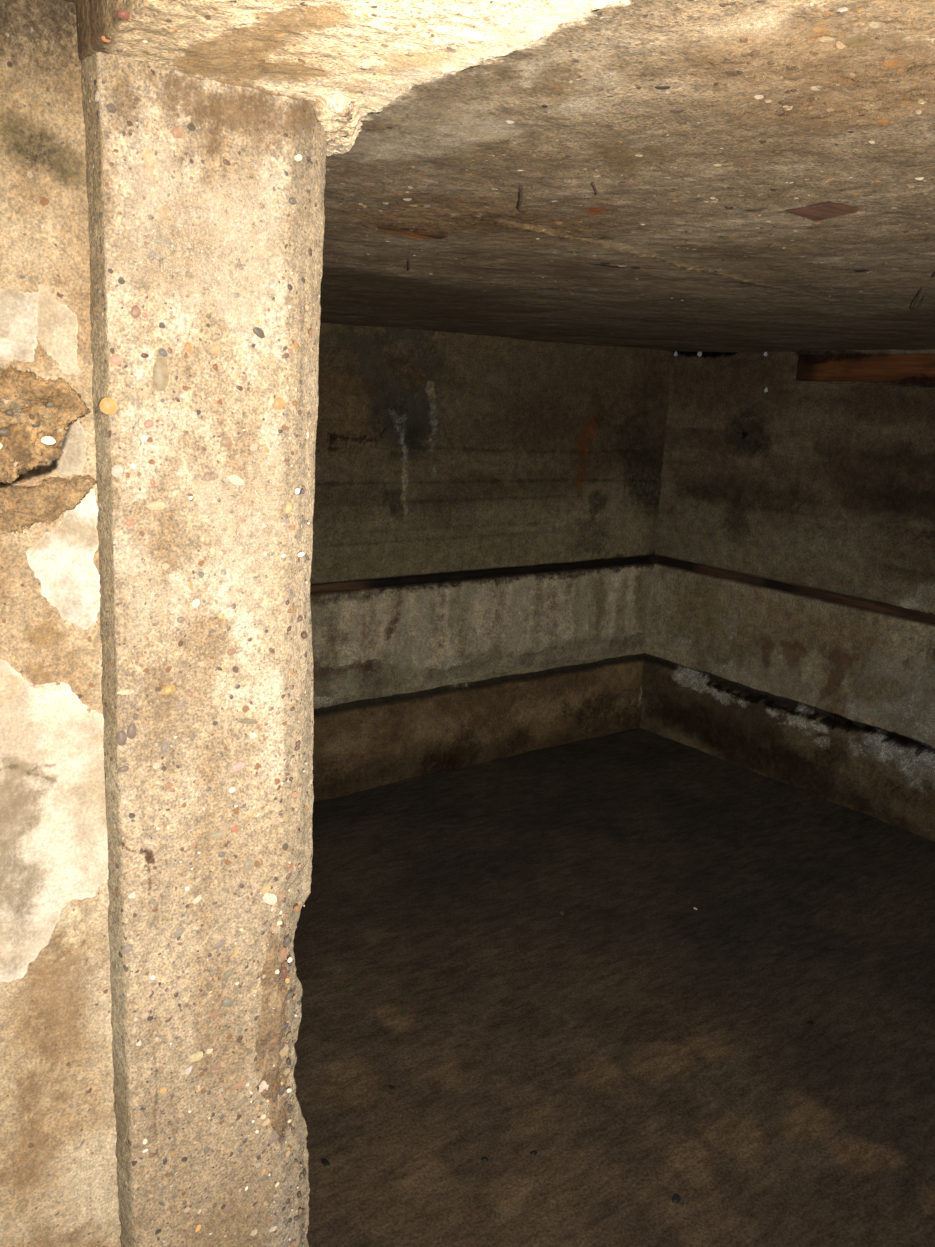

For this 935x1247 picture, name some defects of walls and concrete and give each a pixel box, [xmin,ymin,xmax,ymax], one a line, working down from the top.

water stain [156,4,351,154]
peeling [0,285,101,630]
peeling [0,659,154,983]
water stain [564,648,935,830]